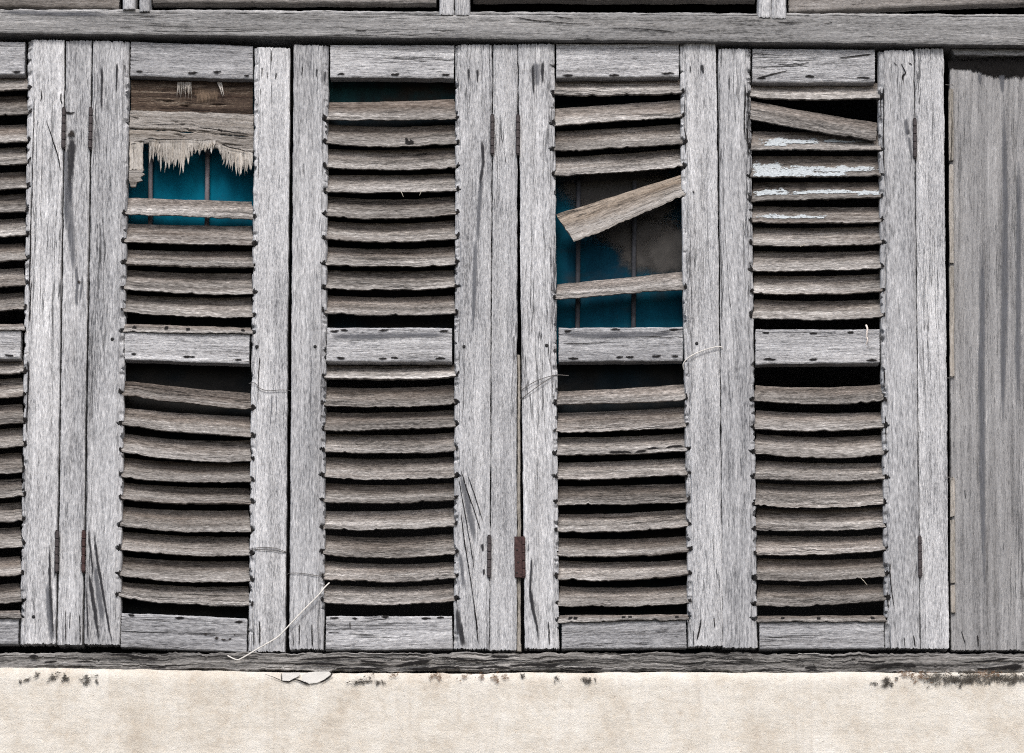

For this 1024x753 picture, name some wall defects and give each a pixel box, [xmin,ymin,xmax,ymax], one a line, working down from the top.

peeling [759,137,864,146]
peeling [752,161,880,196]
damp [19,671,99,686]
damp [918,666,1024,689]